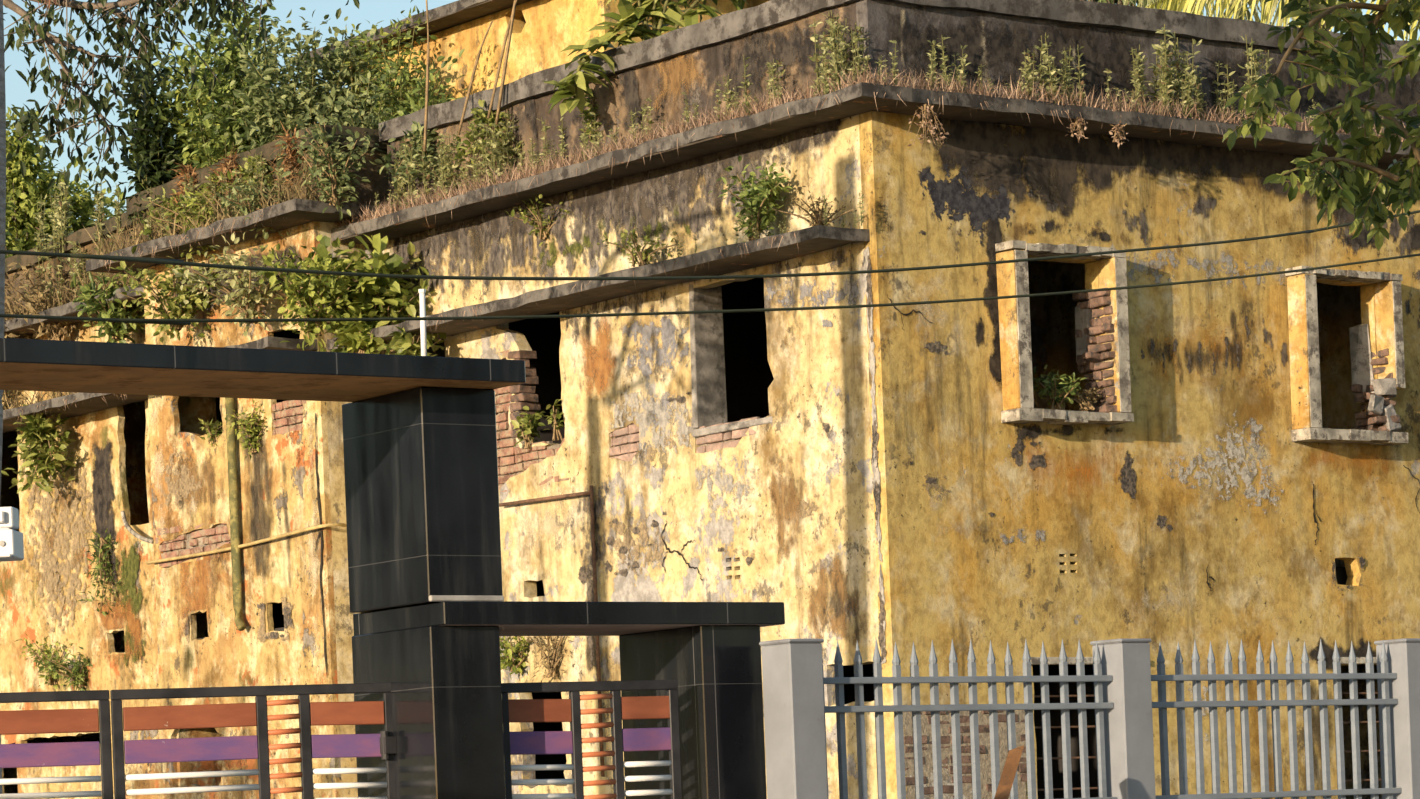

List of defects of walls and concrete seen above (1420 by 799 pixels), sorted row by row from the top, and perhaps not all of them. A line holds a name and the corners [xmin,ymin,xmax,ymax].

leakage [619,69,641,130]
leakage [722,16,852,100]
leakage [921,116,1420,385]
rust [580,317,616,395]
flaking render [155,523,231,568]
crack [661,521,702,580]
flaking render [610,308,760,513]
leakage [769,451,801,557]
leakage [1011,424,1081,470]
leakage [1118,452,1137,503]
peeling [1162,411,1283,514]
leakage [808,556,865,644]